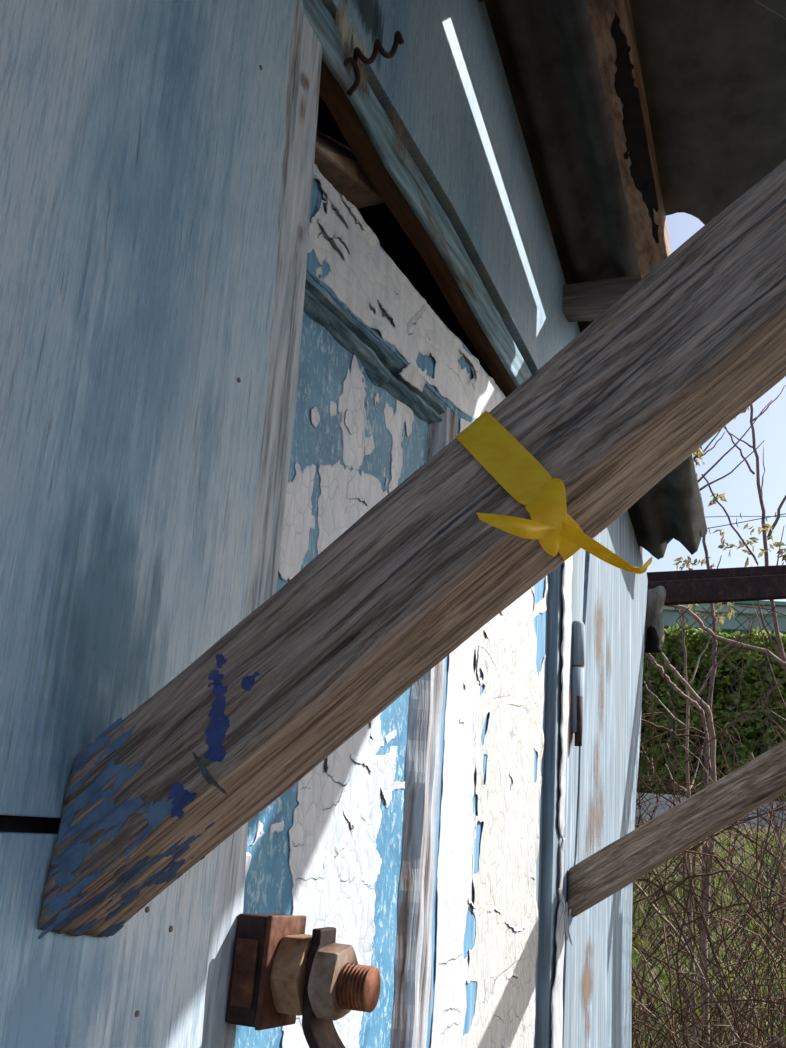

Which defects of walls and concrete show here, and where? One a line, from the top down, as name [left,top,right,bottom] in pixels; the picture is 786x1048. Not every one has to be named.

peeling [308,164,506,433]
peeling [278,354,414,581]
peeling [245,712,406,966]
crack [292,721,388,889]
peeling [430,576,548,1048]
crack [467,889,526,933]
peeling [551,556,573,1048]
peeling [281,1015,309,1048]
peeling [333,1010,363,1048]